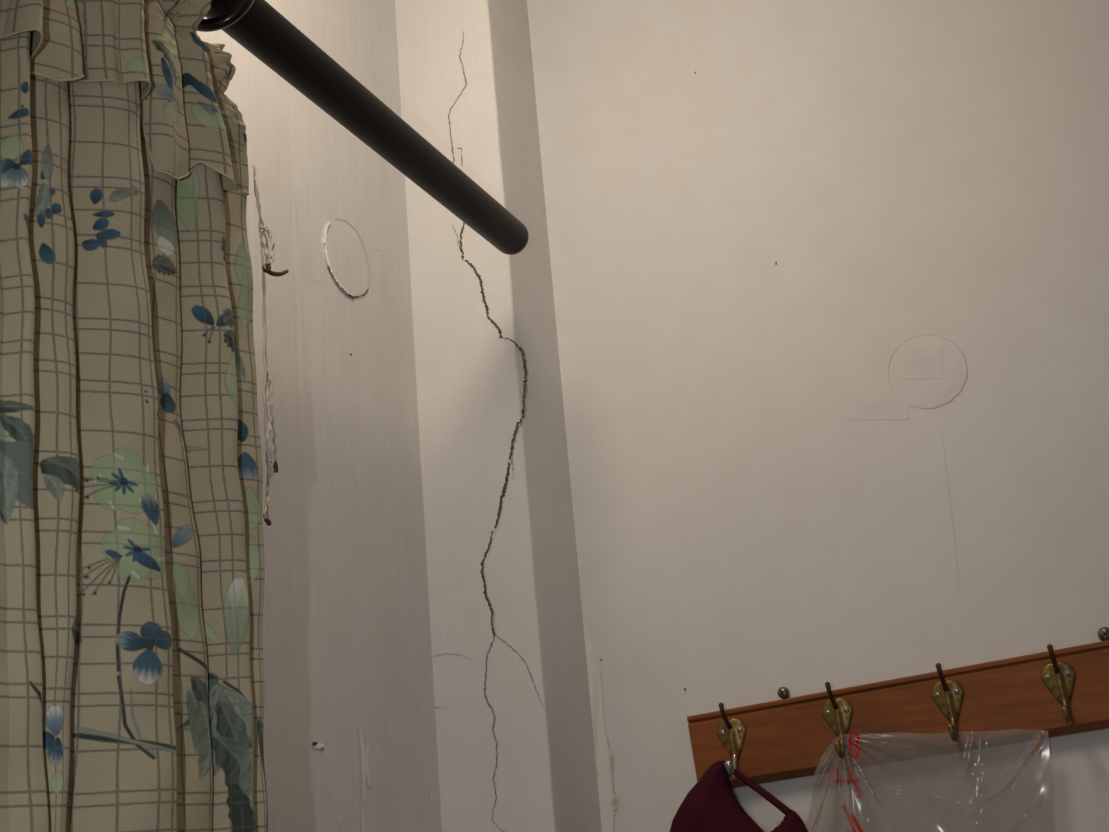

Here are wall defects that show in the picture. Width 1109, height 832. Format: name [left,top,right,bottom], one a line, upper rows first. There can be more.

crack [448,31,467,166]
crack [433,222,543,832]